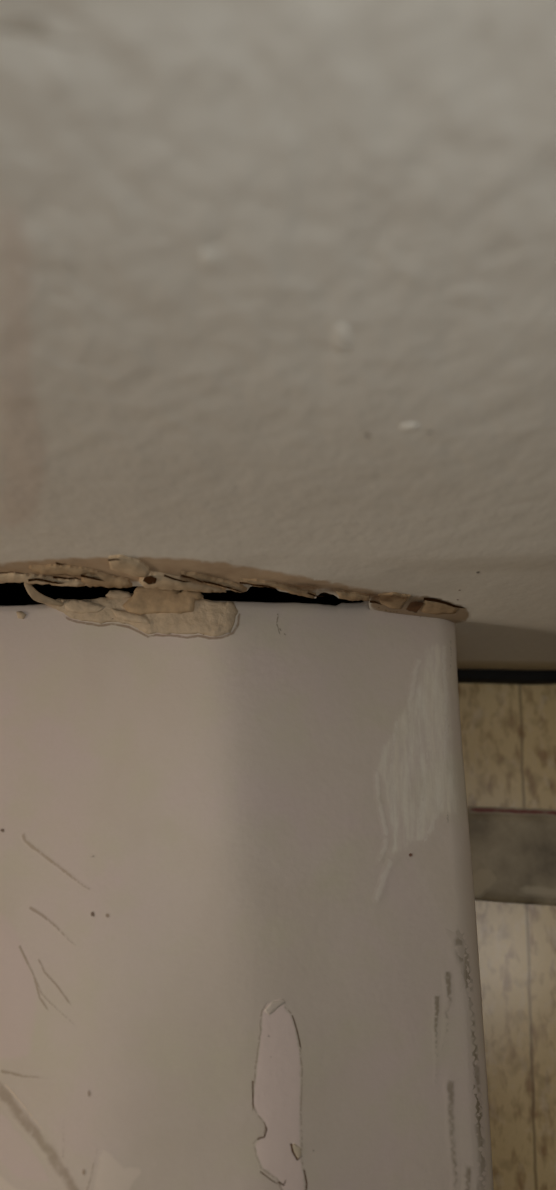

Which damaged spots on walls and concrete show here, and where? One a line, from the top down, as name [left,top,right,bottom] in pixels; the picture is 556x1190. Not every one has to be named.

crack [0,582,137,606]
peeling [0,553,472,641]
crack [180,586,382,641]
crack [424,598,463,608]
peeling [251,997,314,1190]